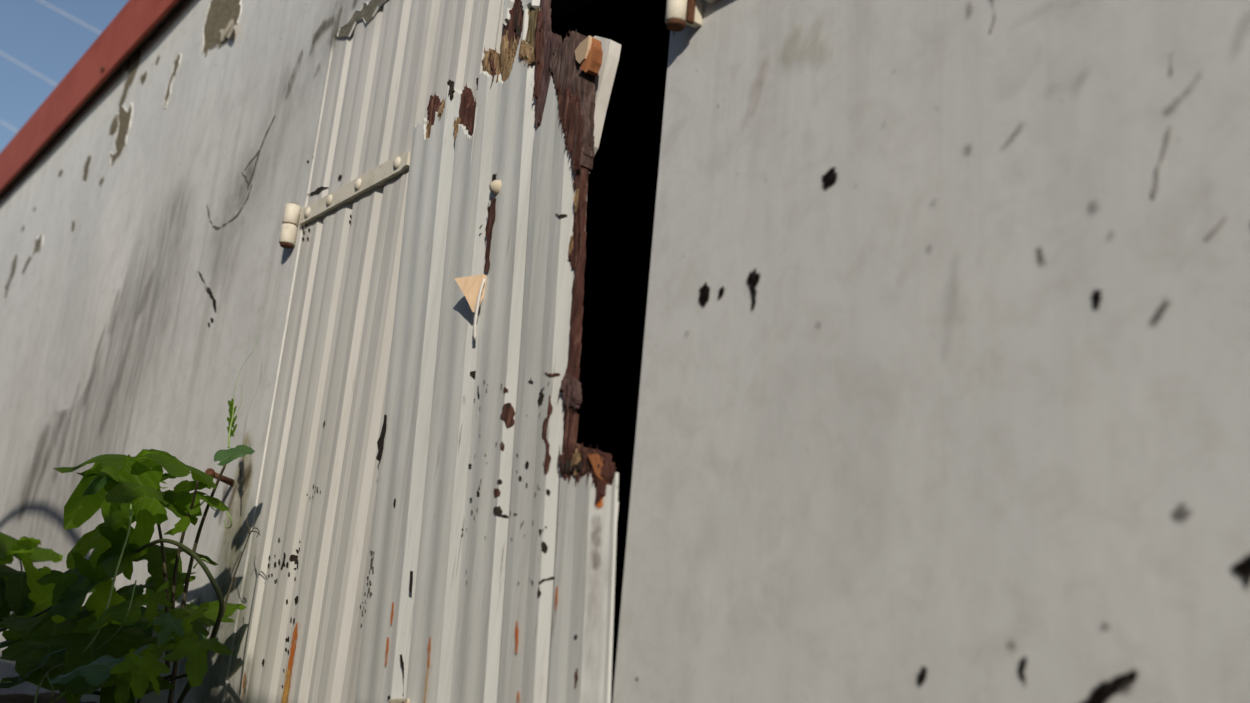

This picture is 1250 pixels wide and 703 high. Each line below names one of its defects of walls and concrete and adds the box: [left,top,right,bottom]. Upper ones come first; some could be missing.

peeling [202,0,242,57]
spalling [337,0,387,38]
peeling [83,51,182,186]
peeling [470,371,560,495]
peeling [470,479,548,554]
spalling [1233,555,1250,588]
corrosion [281,623,297,703]
spalling [1018,657,1027,684]
spalling [1081,669,1138,703]